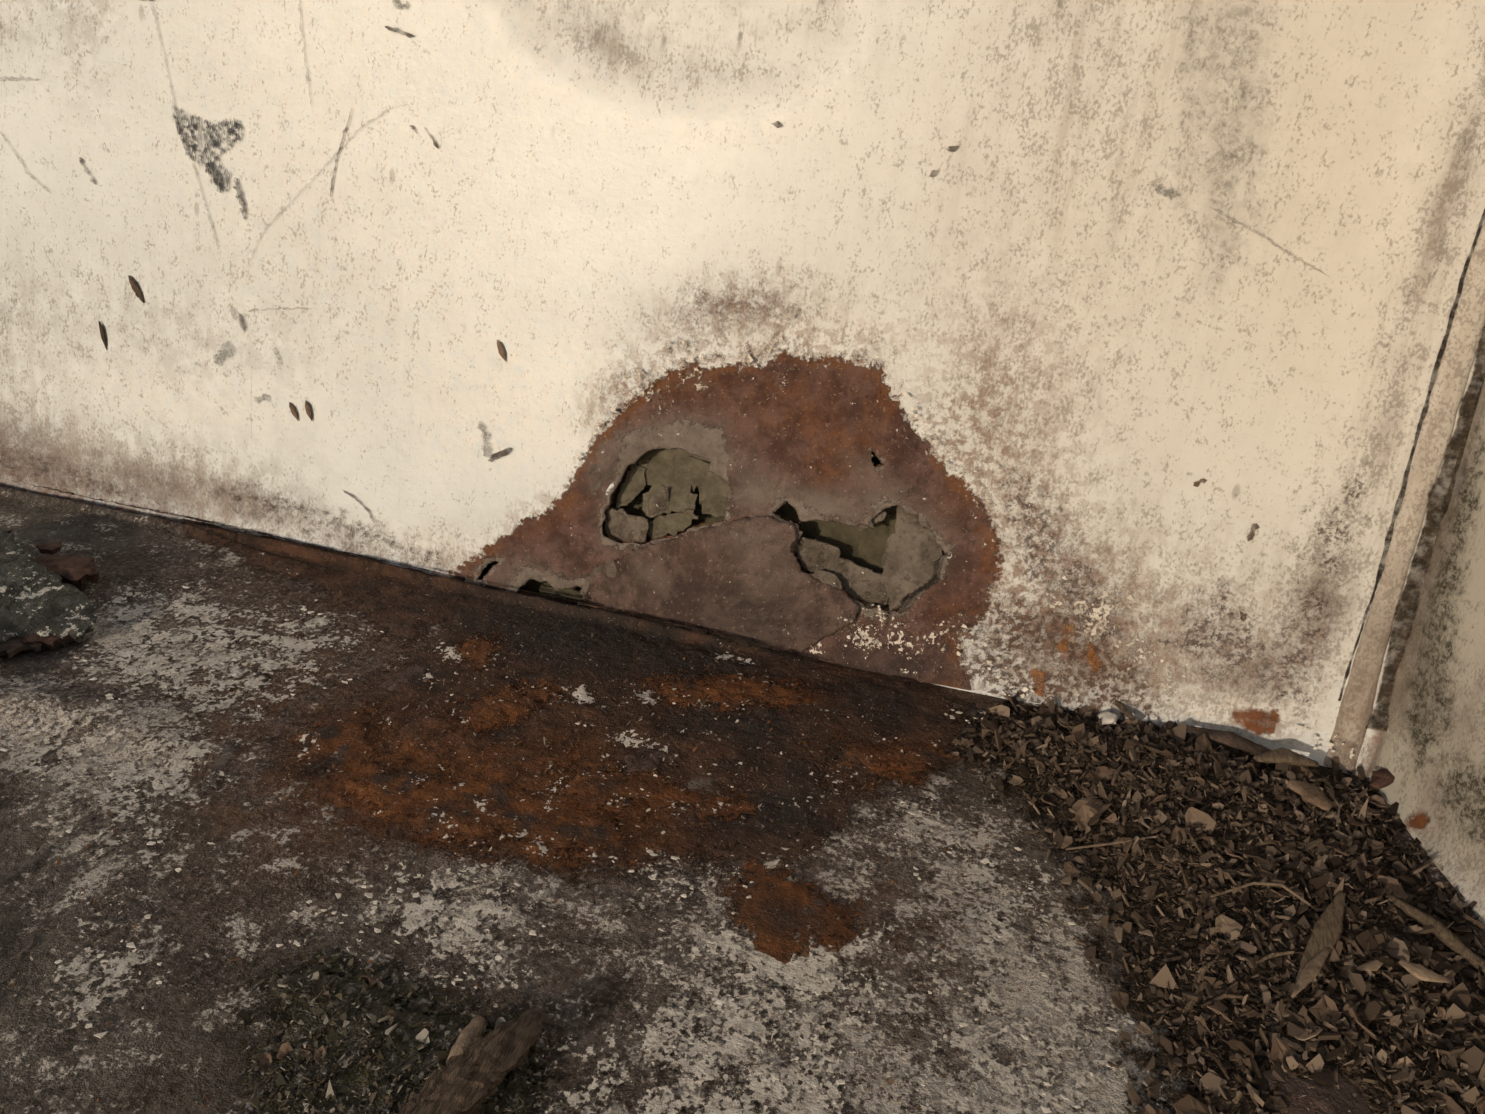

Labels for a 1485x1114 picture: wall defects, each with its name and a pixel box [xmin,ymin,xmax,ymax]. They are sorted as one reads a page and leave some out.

peeling [604,448,730,543]
rust [154,347,1044,975]
peeling [795,505,942,650]
peeling [947,614,1035,707]
rust [1232,709,1280,735]
mould [1404,429,1485,841]
peeling [0,571,383,1082]
peeling [276,848,560,994]